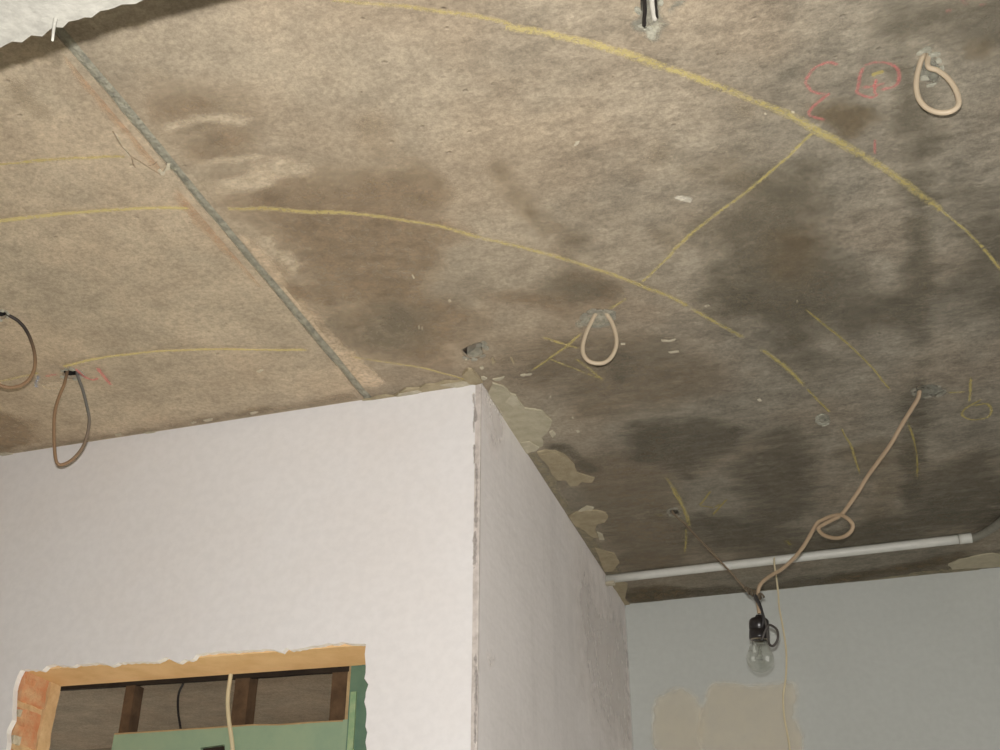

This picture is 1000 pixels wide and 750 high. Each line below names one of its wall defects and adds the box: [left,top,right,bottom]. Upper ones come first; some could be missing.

leakage [155,96,473,362]
leakage [707,169,1000,359]
leakage [527,336,712,415]
flaking render [568,505,630,605]
leakage [548,397,1000,570]